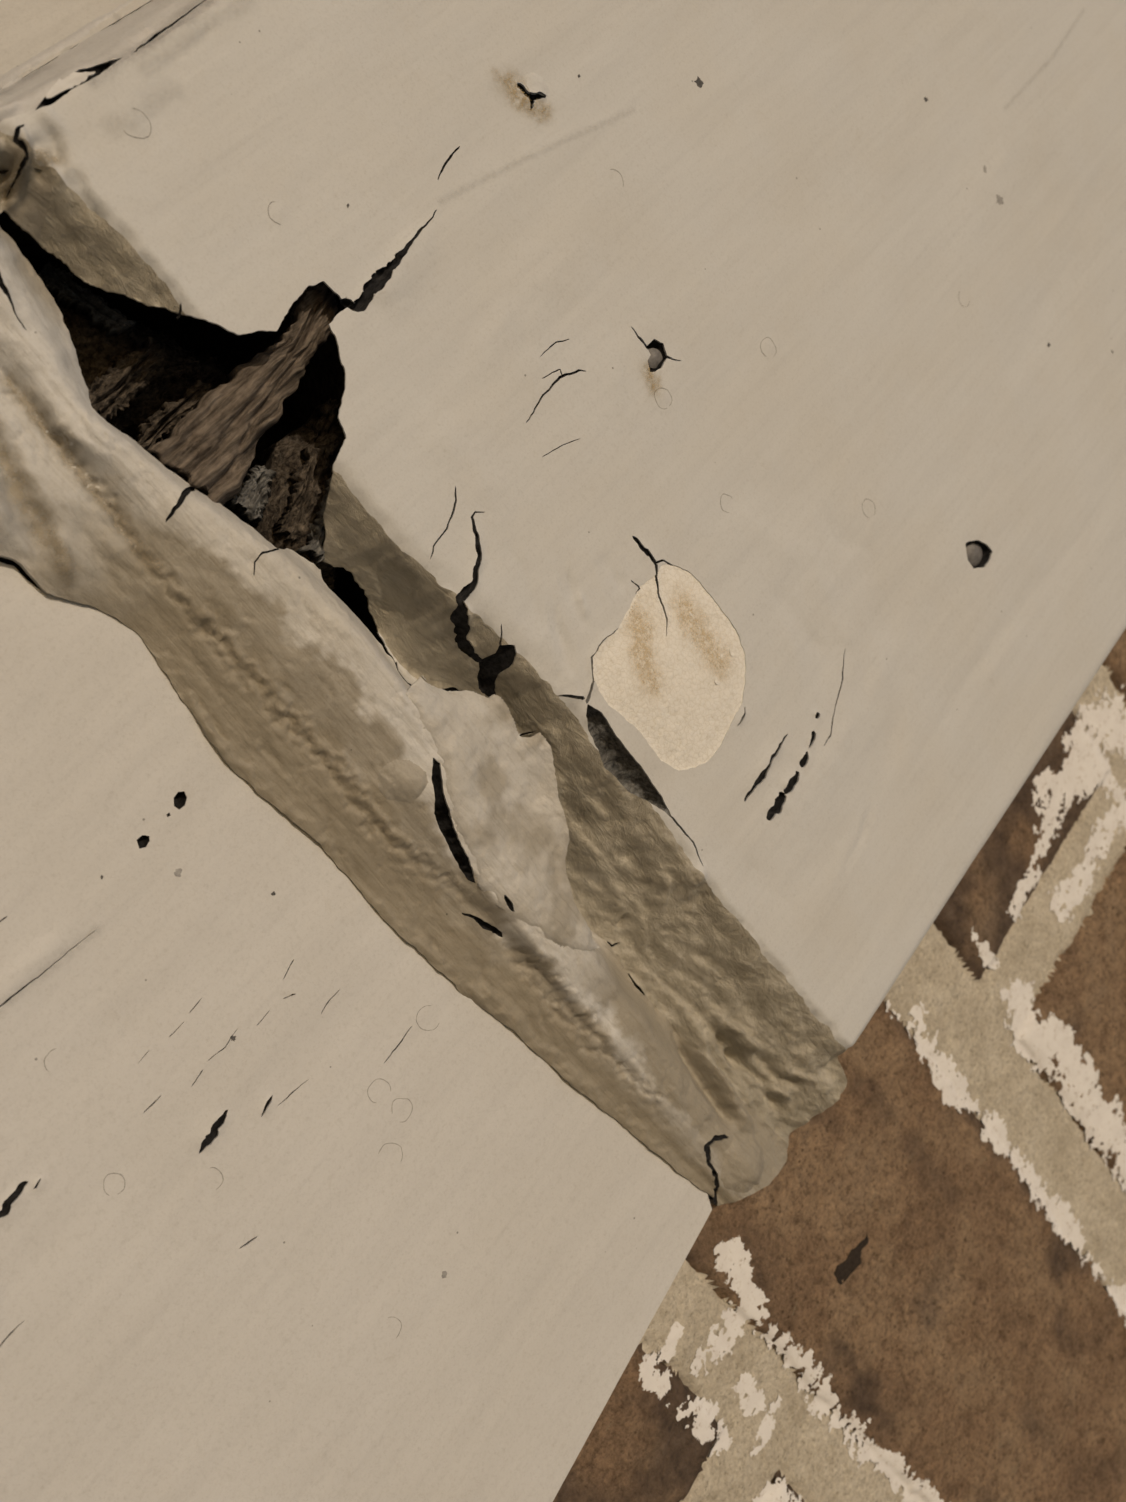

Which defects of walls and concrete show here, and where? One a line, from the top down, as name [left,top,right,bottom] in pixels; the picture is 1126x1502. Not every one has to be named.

crack [135,0,206,52]
spalling [0,212,305,374]
spalling [322,282,345,316]
crack [340,147,459,312]
spalling [248,334,345,470]
spalling [332,567,392,658]
crack [395,489,516,697]
peeling [592,564,746,770]
crack [744,668,843,820]
crack [432,758,513,937]
crack [0,931,94,1007]